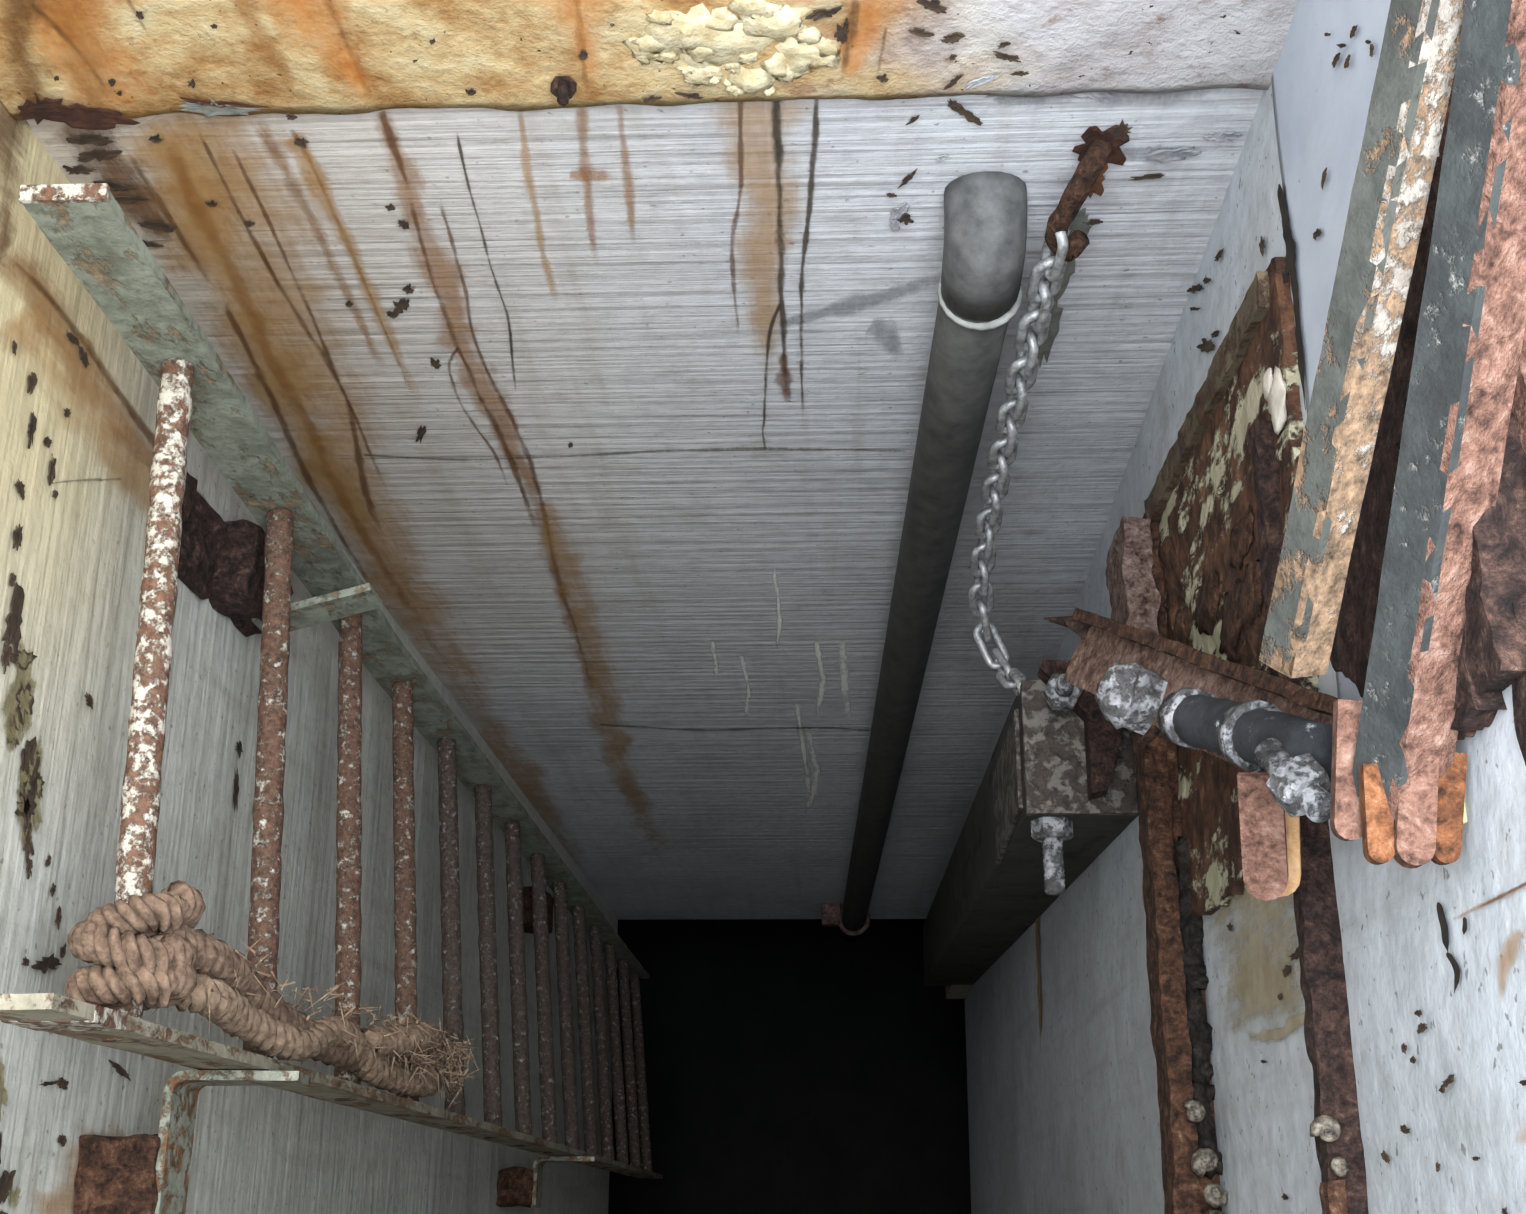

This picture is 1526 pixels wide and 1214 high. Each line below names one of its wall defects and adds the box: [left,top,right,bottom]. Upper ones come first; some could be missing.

peeling [1324,25,1374,69]
corrosion [67,129,205,276]
corrosion [231,160,373,510]
corrosion [380,113,406,179]
corrosion [457,138,515,381]
damp [622,0,915,418]
peeling [1187,277,1211,311]
peeling [1196,330,1219,353]
corrosion [227,310,357,561]
corrosion [442,212,576,631]
crack [364,416,891,461]
corrosion [1484,883,1526,905]